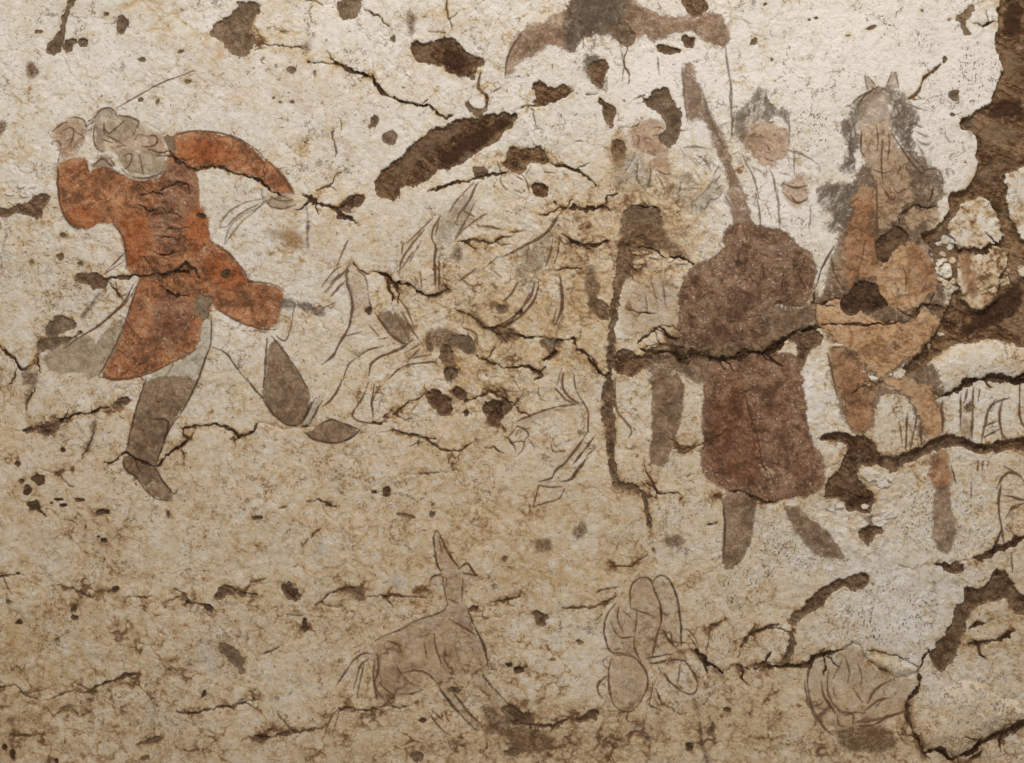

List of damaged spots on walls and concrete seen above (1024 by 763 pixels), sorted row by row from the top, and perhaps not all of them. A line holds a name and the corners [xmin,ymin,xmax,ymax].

spalling [209,1,261,59]
crack [253,26,453,120]
spalling [339,101,518,213]
spalling [642,86,683,148]
flaking render [862,0,1024,386]
crack [353,161,940,529]
crack [56,404,258,473]
flaking render [820,432,1024,546]
crack [694,619,843,685]
flaking render [929,569,1024,672]
crack [968,621,1015,659]
crack [868,649,1024,760]